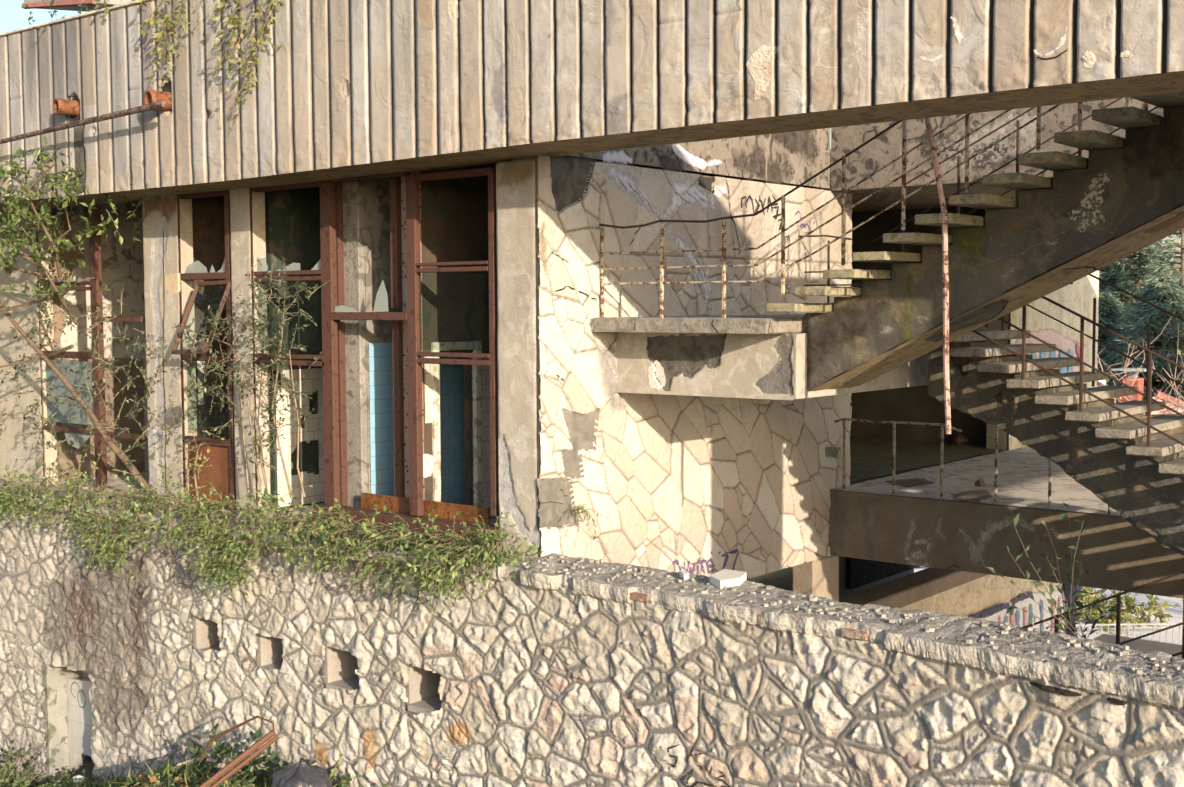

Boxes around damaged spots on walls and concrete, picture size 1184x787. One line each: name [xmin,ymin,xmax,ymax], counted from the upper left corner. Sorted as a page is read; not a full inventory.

spalling [646,333,727,391]
spalling [755,335,794,396]
leakage [45,557,147,728]